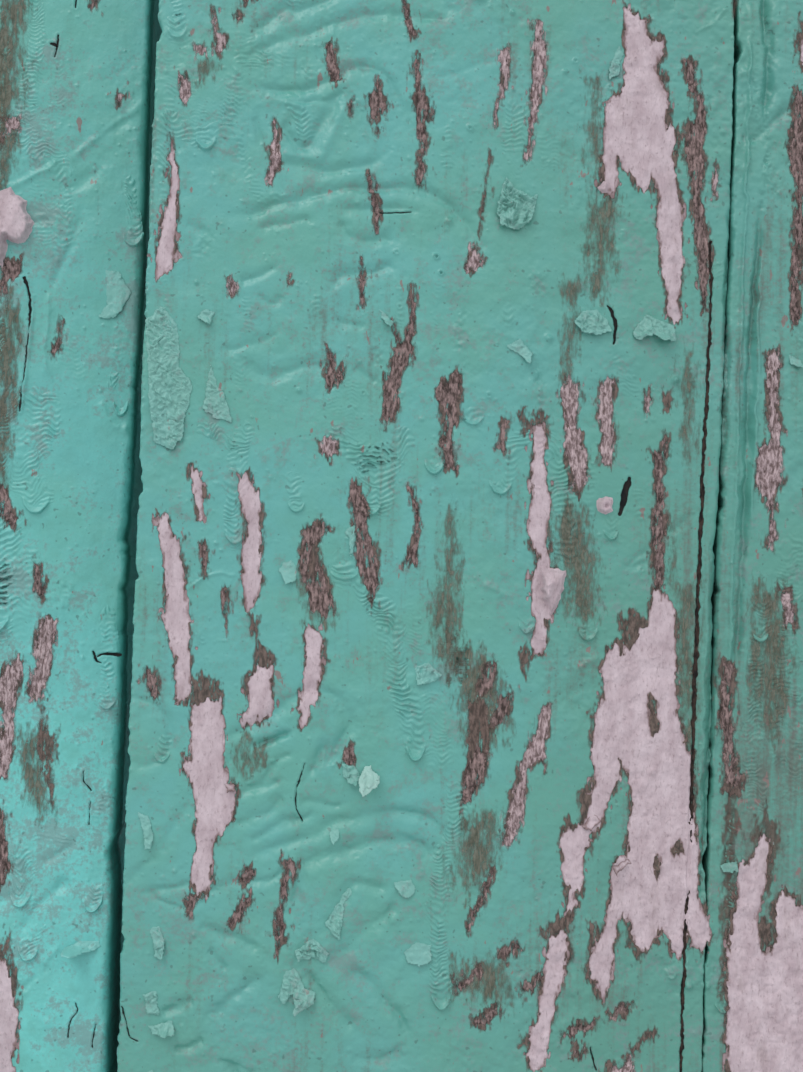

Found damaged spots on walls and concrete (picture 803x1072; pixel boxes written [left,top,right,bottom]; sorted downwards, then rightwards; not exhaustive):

peeling [594,2,720,342]
peeling [0,808,13,892]
peeling [138,463,382,919]
peeling [458,406,559,814]
peeling [502,702,552,847]
peeling [556,374,619,501]
peeling [518,432,803,1072]
crack [688,241,714,843]
peeling [754,345,803,550]
peeling [0,932,22,1072]
crack [679,890,690,1072]